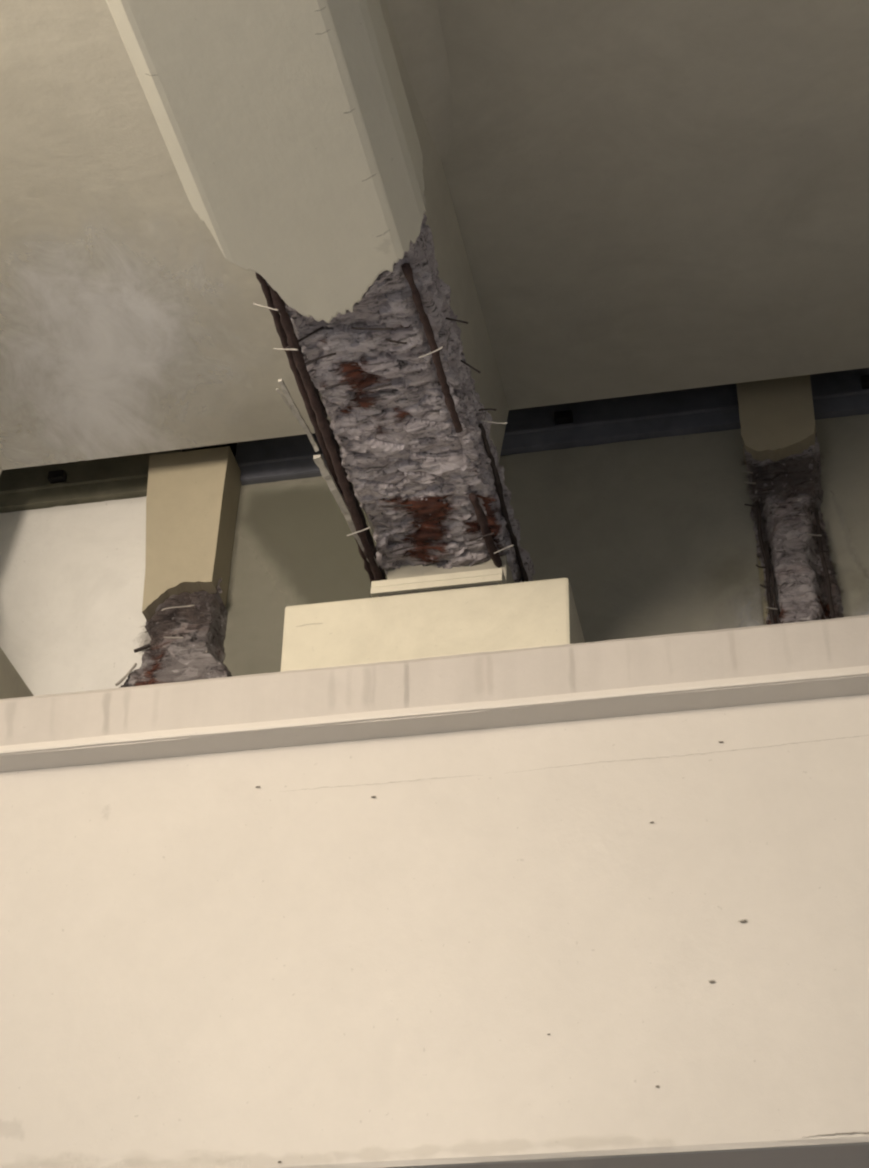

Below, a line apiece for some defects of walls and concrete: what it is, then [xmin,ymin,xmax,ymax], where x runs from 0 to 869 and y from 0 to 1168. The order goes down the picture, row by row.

spalling [253,214,536,583]
spalling [741,434,844,625]
spalling [115,578,232,688]
crack [802,1131,869,1139]